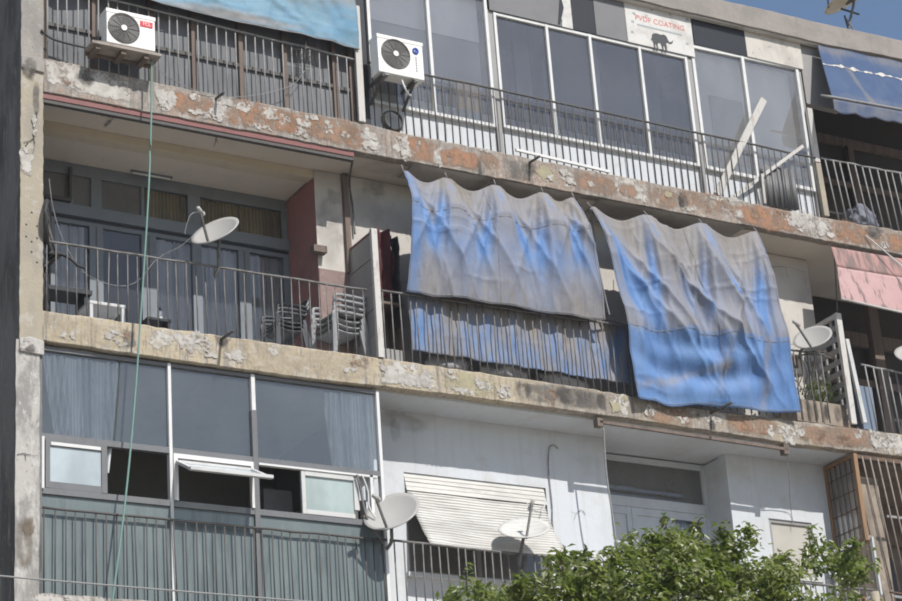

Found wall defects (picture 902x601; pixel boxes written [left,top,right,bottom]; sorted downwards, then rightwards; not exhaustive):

peeling [23,60,132,102]
peeling [155,90,379,153]
peeling [19,147,34,175]
peeling [547,166,902,252]
peeling [149,330,284,371]
leakage [522,384,605,408]
peeling [610,394,629,415]
spalling [699,411,725,429]
peeling [766,424,805,445]
peeling [854,428,902,454]